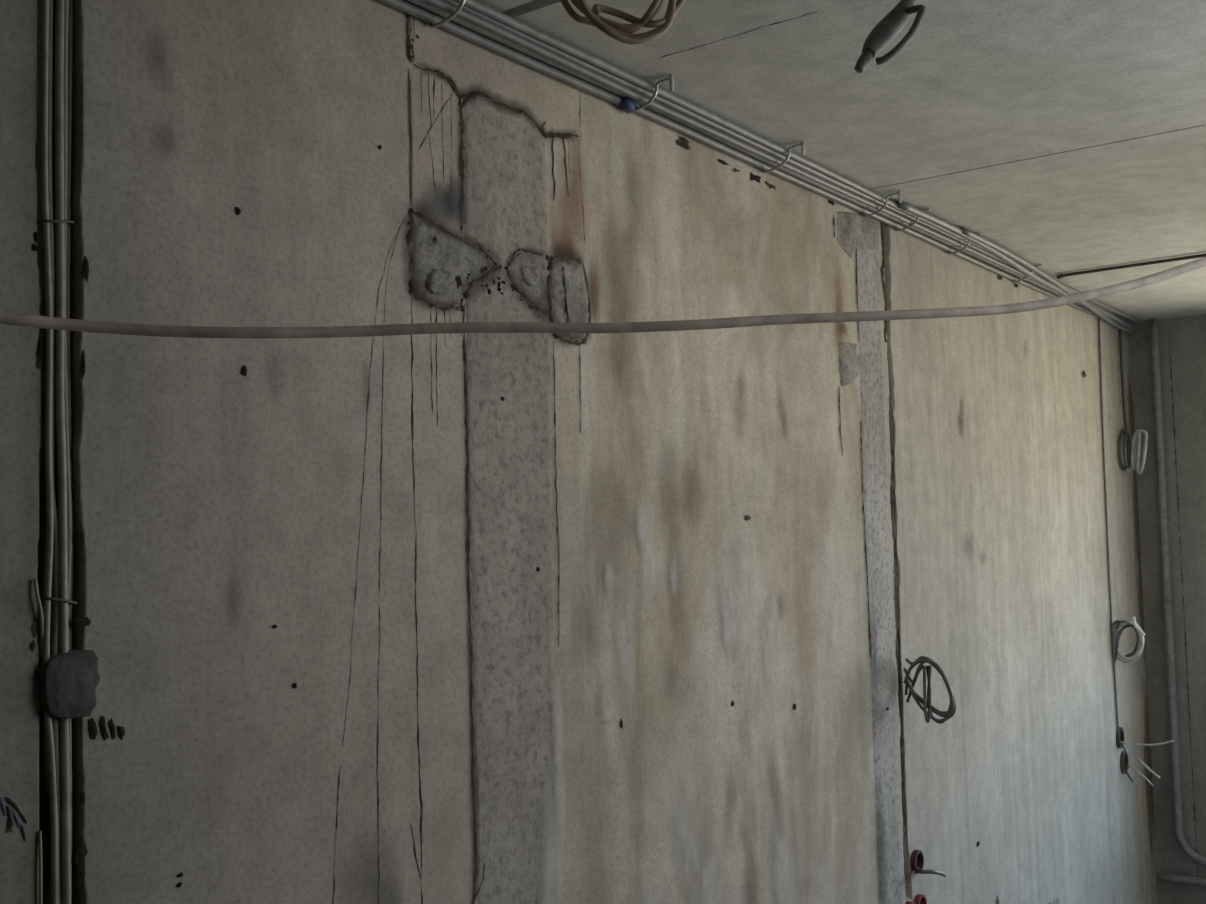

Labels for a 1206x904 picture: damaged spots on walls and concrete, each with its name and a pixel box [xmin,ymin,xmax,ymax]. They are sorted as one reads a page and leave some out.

crack [332,1,585,904]